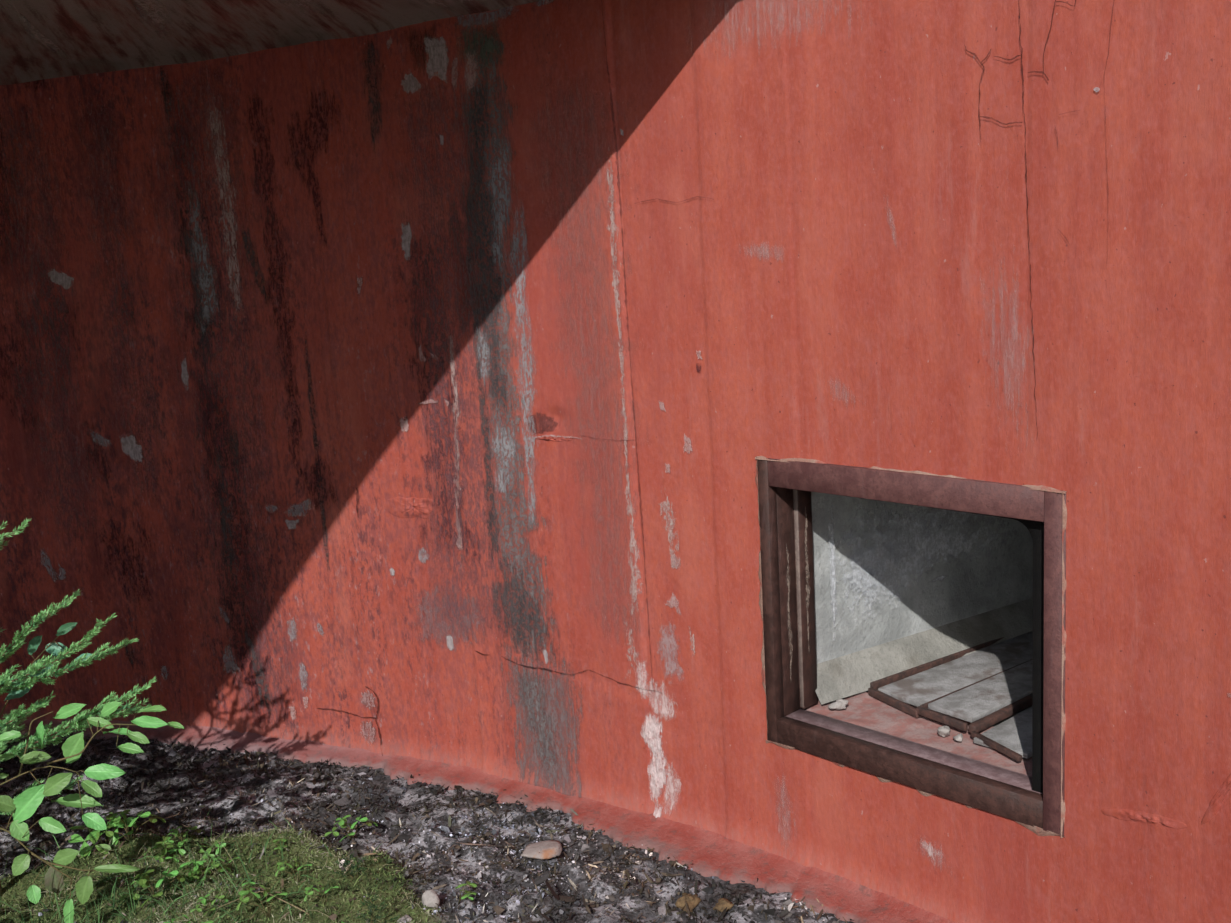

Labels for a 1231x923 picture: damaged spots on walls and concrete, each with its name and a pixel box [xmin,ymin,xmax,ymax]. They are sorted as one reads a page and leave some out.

damp [154,67,341,725]
spalling [402,37,477,93]
damp [405,22,582,798]
crack [476,651,663,694]
damp [607,160,642,614]
damp [625,626,683,818]
damp [658,497,680,569]
crack [965,0,1076,440]